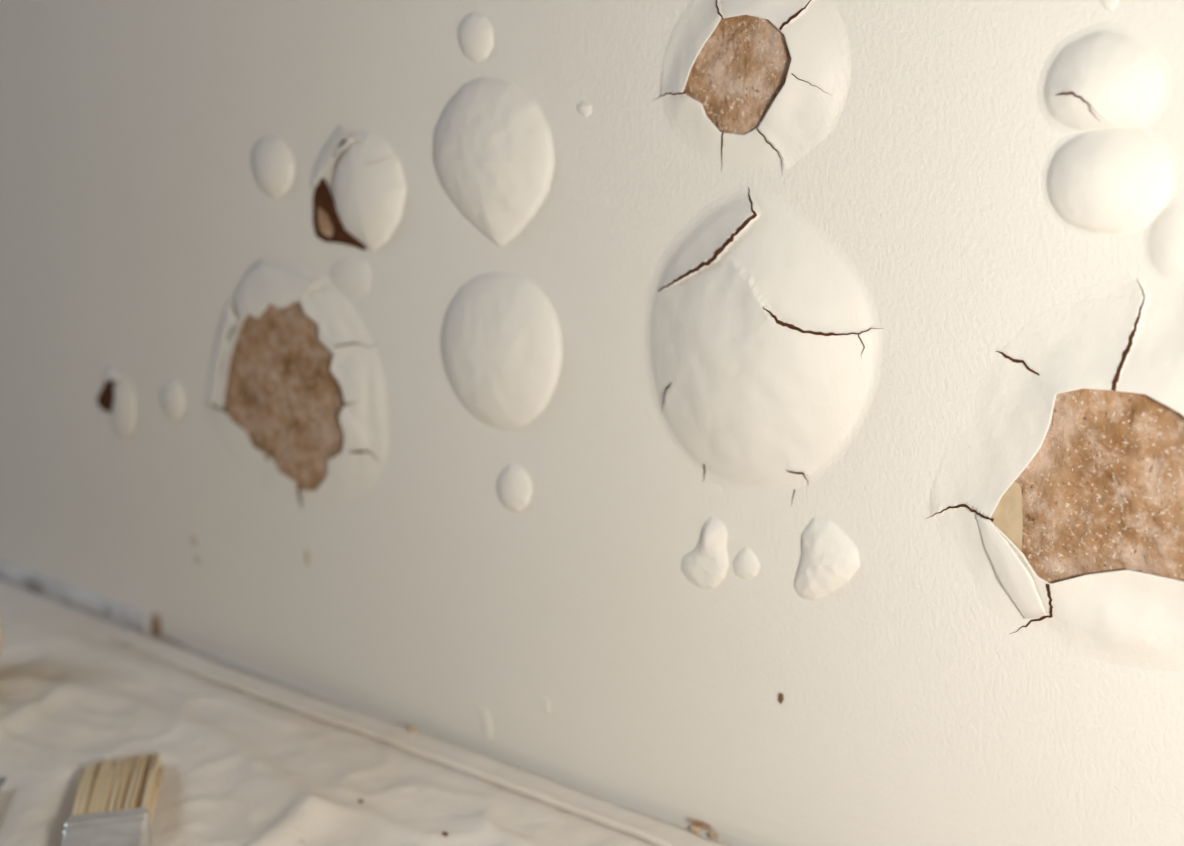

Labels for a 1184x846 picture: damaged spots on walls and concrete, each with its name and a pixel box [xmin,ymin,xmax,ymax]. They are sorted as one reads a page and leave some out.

peeling [654,0,851,172]
peeling [203,261,390,510]
peeling [928,271,1184,672]